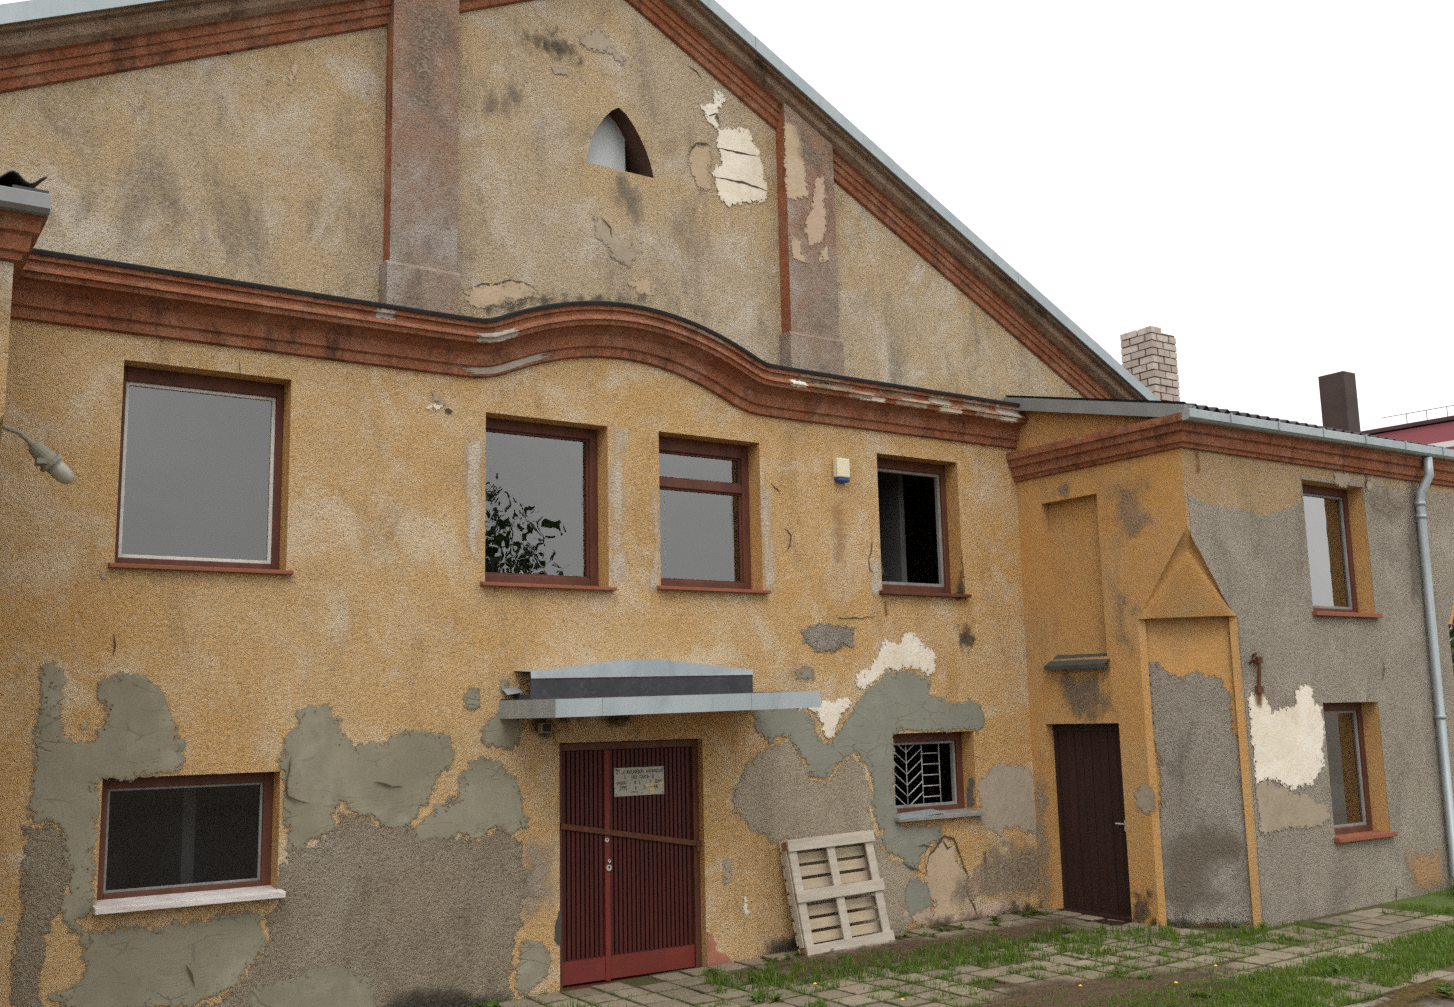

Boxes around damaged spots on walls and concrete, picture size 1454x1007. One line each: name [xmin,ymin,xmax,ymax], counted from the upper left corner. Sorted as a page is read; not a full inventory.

peeling [687,90,829,266]
peeling [799,631,937,739]
flaking render [1134,475,1454,928]
flaking render [9,823,73,1007]
flaking render [186,810,534,1007]
peeling [722,857,749,917]
flaking render [731,739,1049,944]